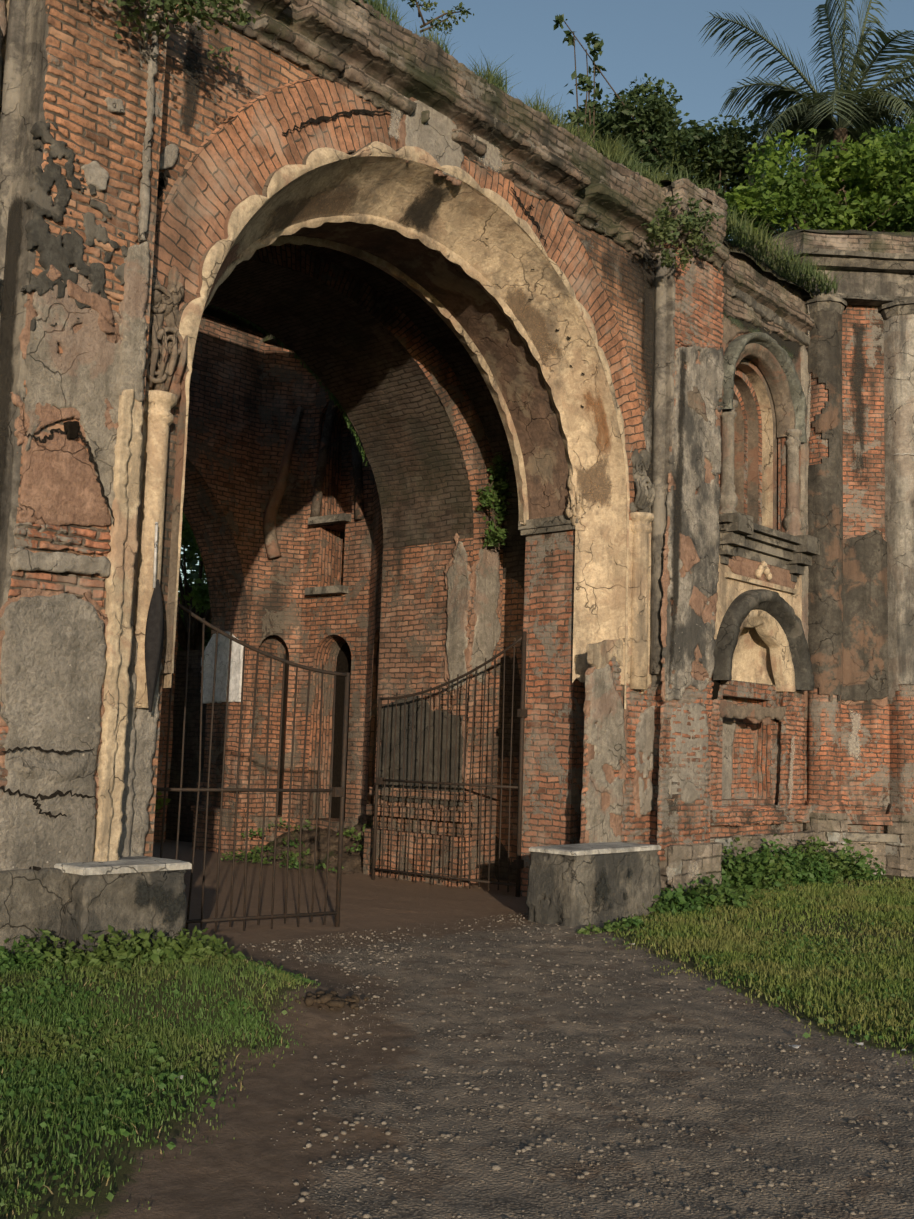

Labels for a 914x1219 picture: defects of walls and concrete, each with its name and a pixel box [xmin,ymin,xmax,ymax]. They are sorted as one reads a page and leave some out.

damp [181,21,204,133]
crack [282,109,394,135]
flaking render [41,0,157,334]
flaking render [159,144,179,170]
damp [399,182,450,230]
flaking render [13,402,112,554]
flaking render [679,533,700,572]
flaking render [587,639,632,669]
crack [1,746,94,755]
crack [0,785,97,818]